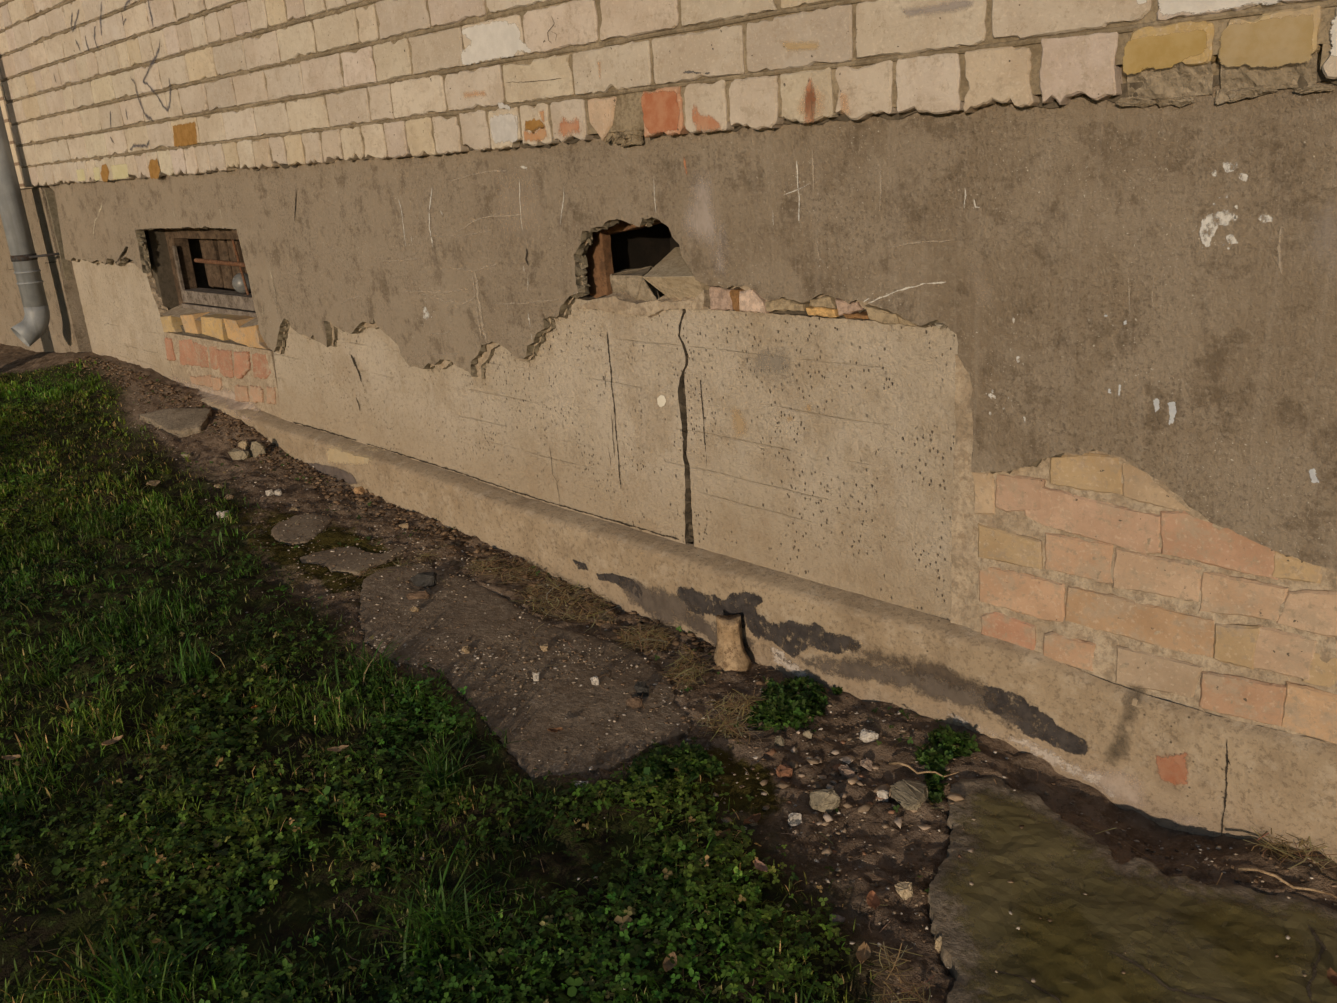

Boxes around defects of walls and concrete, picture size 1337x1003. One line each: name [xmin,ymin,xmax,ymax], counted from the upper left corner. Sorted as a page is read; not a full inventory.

peeling [1137,0,1289,15]
spalling [1107,16,1337,108]
spalling [1037,94,1086,108]
spalling [783,114,851,125]
spalling [871,110,918,120]
spalling [184,164,300,176]
crack [679,313,707,466]
peeling [273,219,1337,745]
crack [1221,743,1230,835]